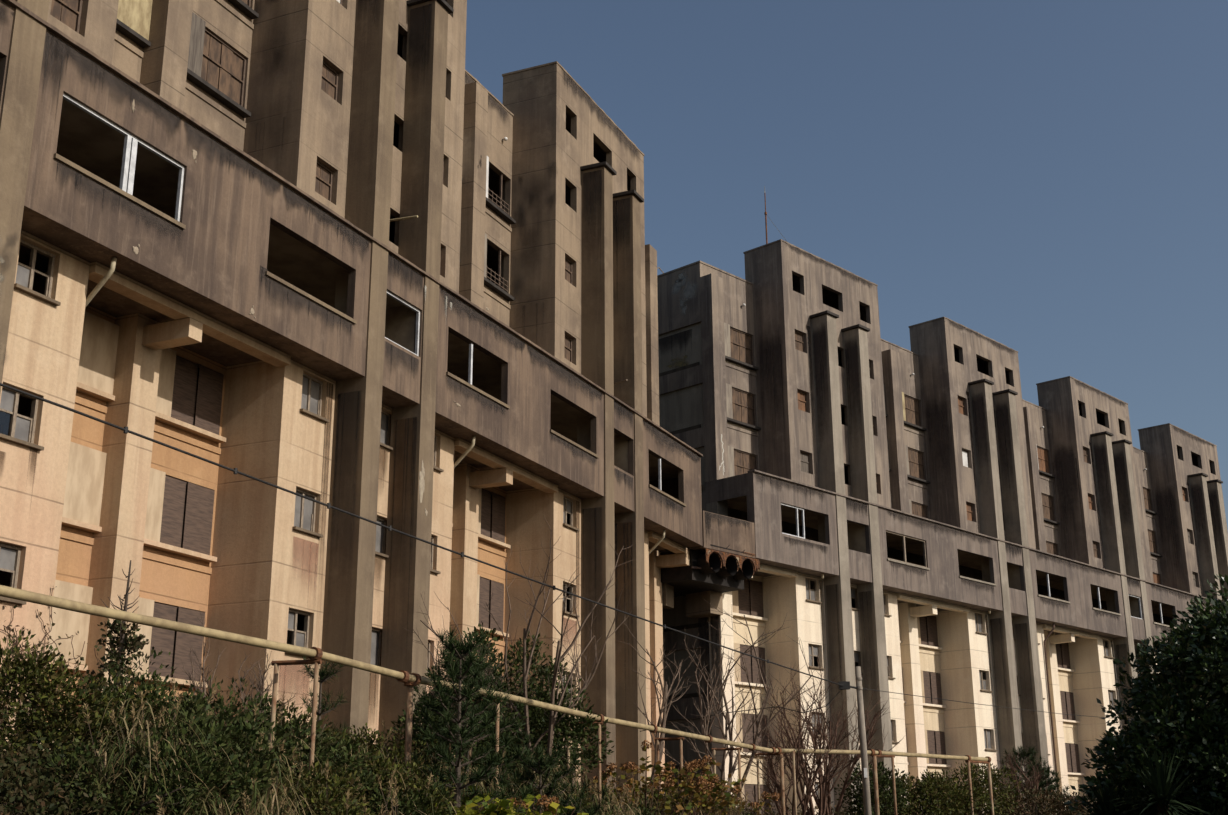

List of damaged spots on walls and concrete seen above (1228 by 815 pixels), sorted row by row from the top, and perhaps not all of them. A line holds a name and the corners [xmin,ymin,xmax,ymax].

water stain [42,32,369,252]
water stain [583,170,630,235]
water stain [388,254,426,295]
water stain [386,342,419,372]
water stain [441,288,700,462]
water stain [1075,380,1124,405]
water stain [926,403,951,460]
water stain [967,392,1012,467]
water stain [1053,443,1129,514]
water stain [1156,483,1221,546]